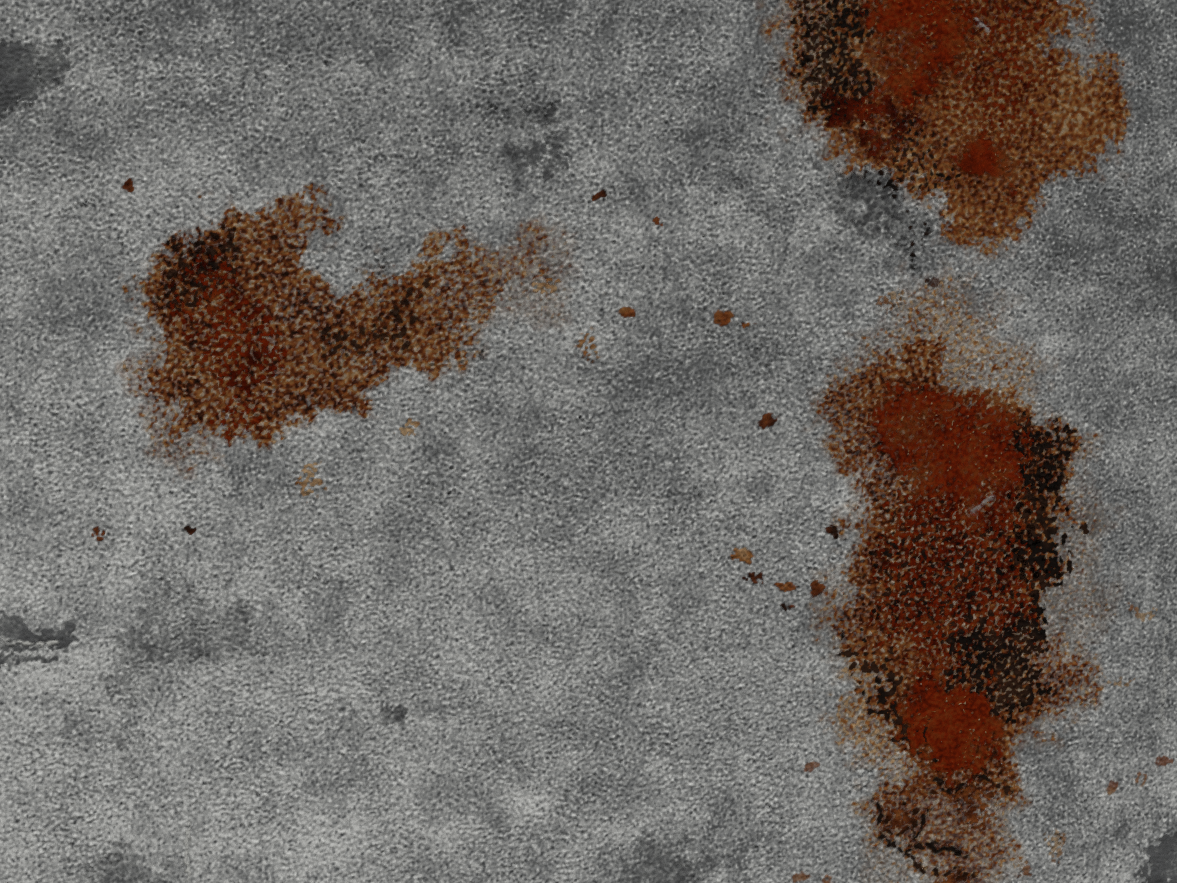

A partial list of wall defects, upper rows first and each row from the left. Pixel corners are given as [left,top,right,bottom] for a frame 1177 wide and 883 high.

rust [763,0,1131,257]
rust [122,183,568,471]
rust [758,413,777,429]
rust [730,547,796,611]
rust [810,276,1135,883]
rust [793,873,831,883]